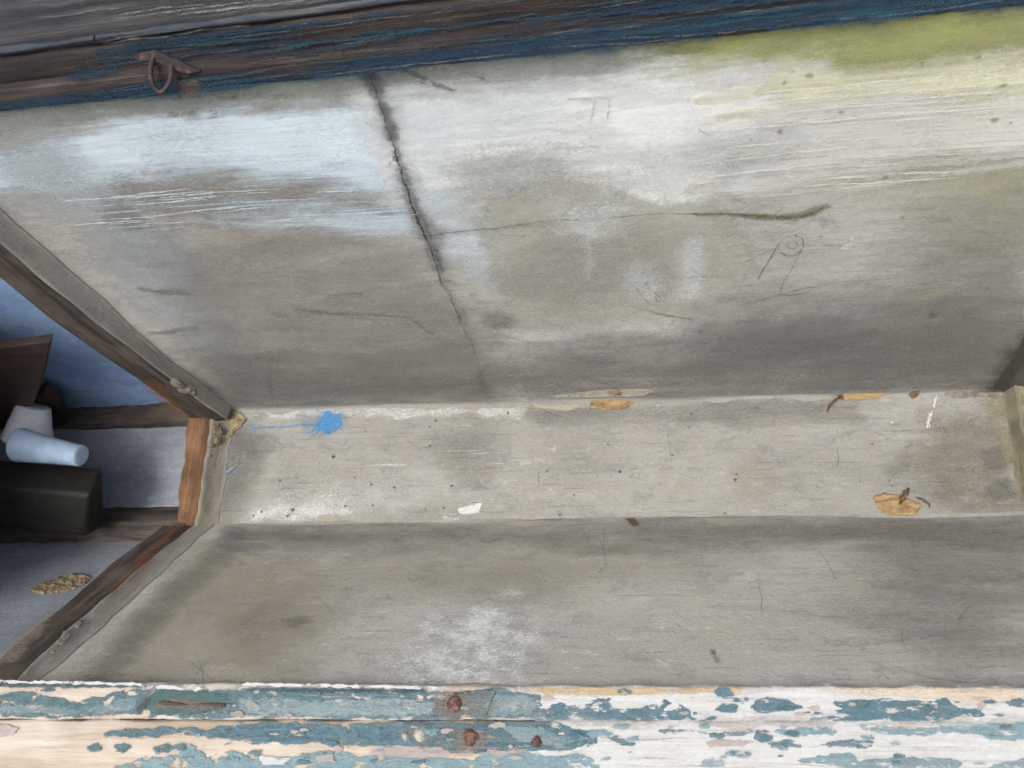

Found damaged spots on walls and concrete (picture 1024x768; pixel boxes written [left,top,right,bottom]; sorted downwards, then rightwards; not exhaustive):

leakage [0,0,1002,134]
leakage [686,58,1024,199]
leakage [7,151,419,375]
crack [363,73,830,388]
peeling [0,686,1024,768]